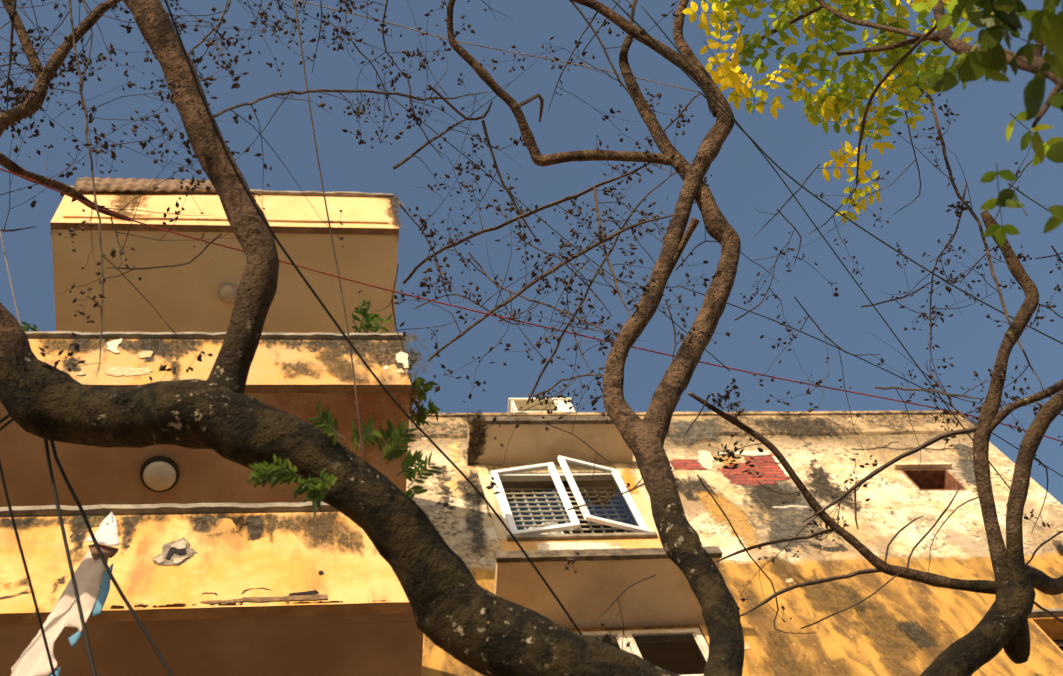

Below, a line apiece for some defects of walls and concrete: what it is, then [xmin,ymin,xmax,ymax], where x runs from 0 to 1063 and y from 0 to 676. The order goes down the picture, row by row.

peeling [107,339,122,353]
peeling [104,351,154,376]
water stain [40,338,223,380]
water stain [668,419,722,444]
water stain [443,411,492,558]
spalling [669,450,791,486]
water stain [951,438,978,495]
water stain [0,514,165,562]
spalling [152,537,197,566]
water stain [180,511,364,554]
water stain [734,415,957,676]